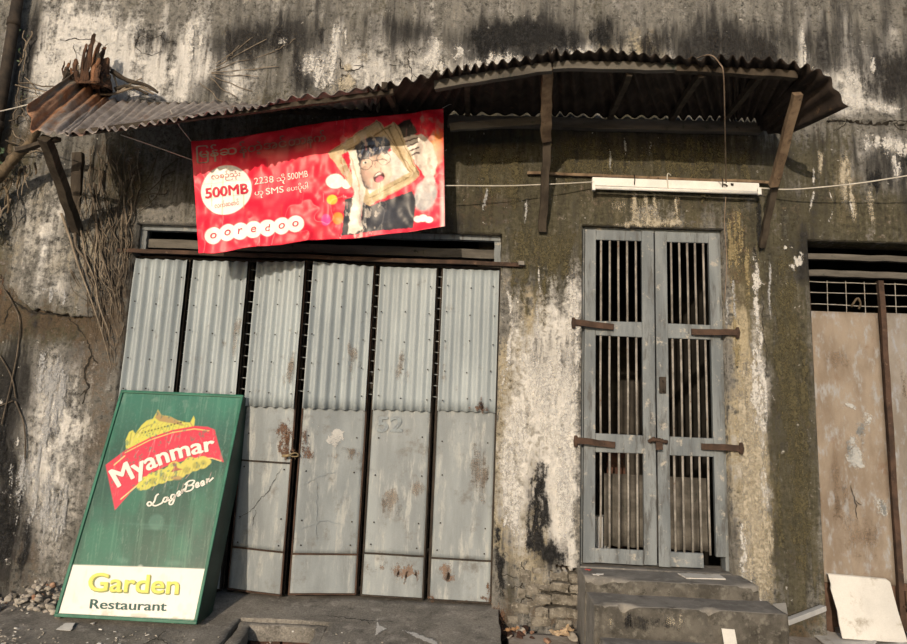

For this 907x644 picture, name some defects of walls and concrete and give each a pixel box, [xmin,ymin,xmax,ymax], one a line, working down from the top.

damp [225,23,347,91]
peeling [302,54,355,90]
peeling [423,37,444,74]
damp [468,16,623,71]
damp [841,50,907,114]
crack [0,274,98,404]
damp [467,142,581,565]
damp [726,194,814,600]
damp [0,353,69,572]
rust [276,420,313,461]
damp [495,528,505,596]
spalling [507,564,578,630]